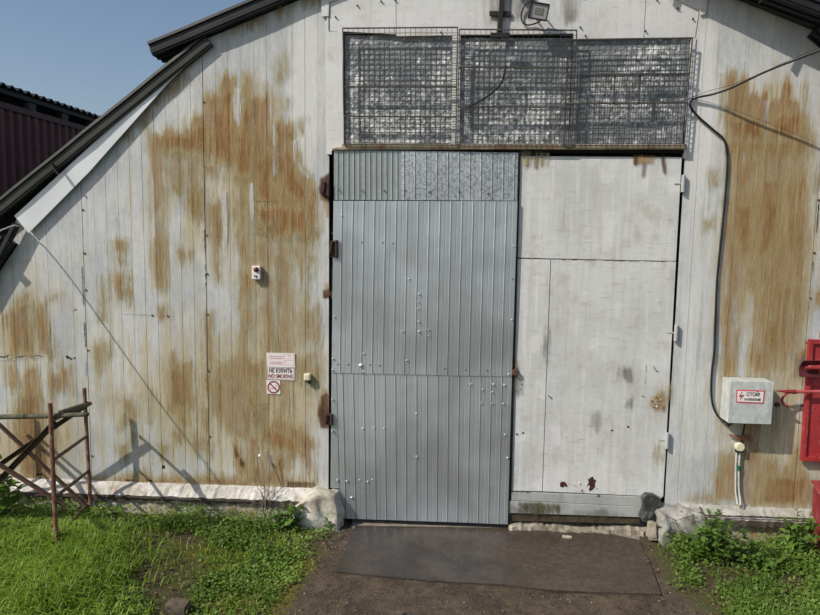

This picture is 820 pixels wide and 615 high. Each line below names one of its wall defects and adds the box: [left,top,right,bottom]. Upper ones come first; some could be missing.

rust [91,69,329,488]
rust [633,156,666,173]
rust [708,70,820,384]
rust [0,291,72,479]
peeling [560,476,596,491]
rust [687,407,813,508]